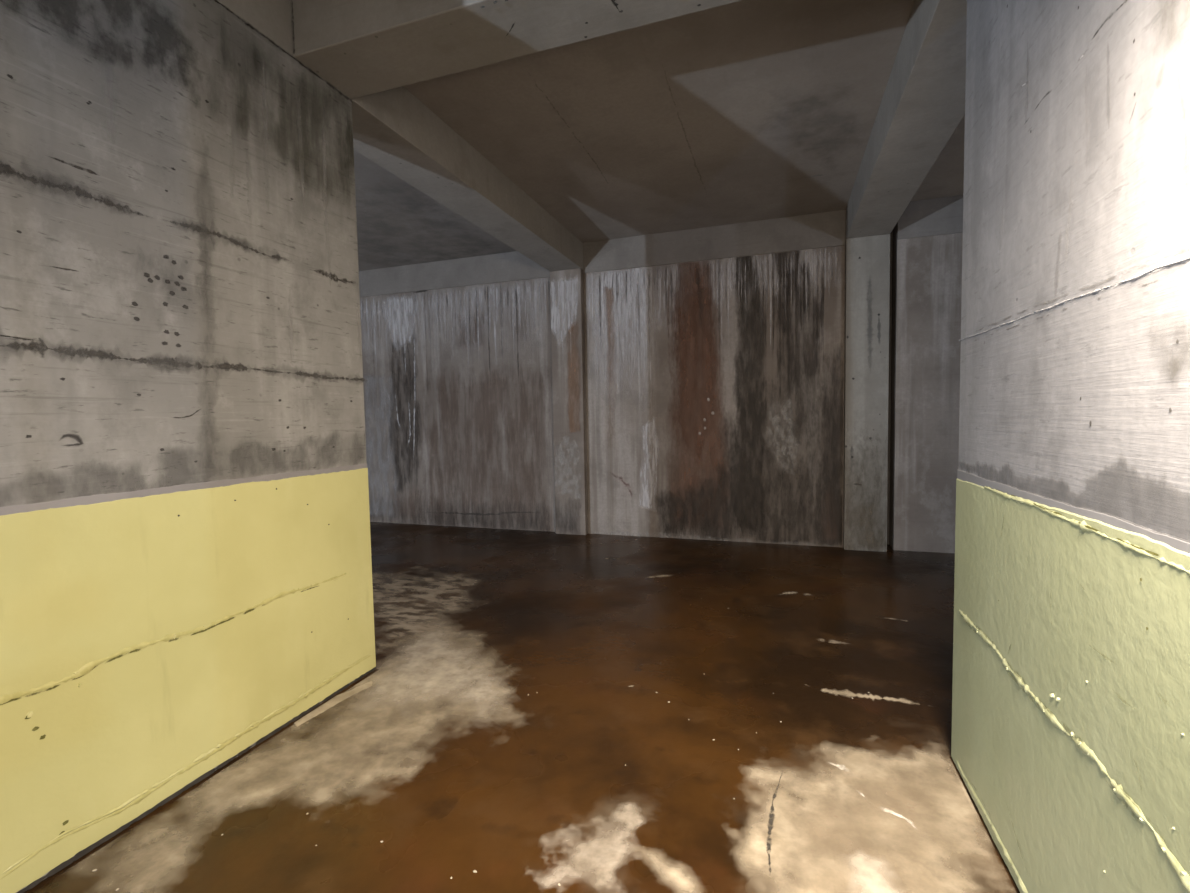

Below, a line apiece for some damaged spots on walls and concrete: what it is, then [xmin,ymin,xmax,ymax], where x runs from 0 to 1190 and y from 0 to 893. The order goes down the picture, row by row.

crack [958,257,1190,341]
water stain [387,298,423,490]
rust [671,262,730,528]
water stain [640,251,887,551]
water stain [966,460,1190,543]
peeling [984,486,1190,575]
water stain [195,573,509,811]
water stain [822,689,910,703]
water stain [546,805,641,884]
water stain [654,858,694,890]
crack [767,777,781,872]
water stain [741,751,987,893]